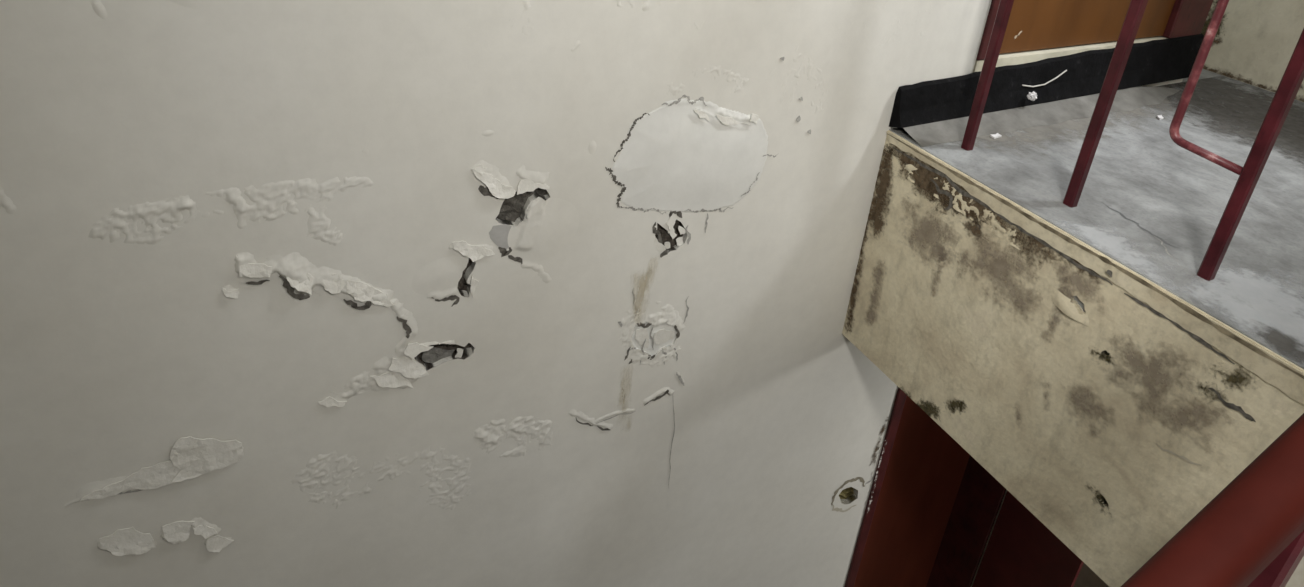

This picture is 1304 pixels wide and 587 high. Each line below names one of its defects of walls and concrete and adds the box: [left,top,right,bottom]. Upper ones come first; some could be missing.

water stain [1201,1,1225,44]
spalling [411,160,579,307]
spalling [652,211,691,258]
water stain [845,129,1099,331]
water stain [1055,223,1162,283]
peeling [221,252,475,408]
spalling [618,288,689,368]
water stain [1187,269,1304,362]
water stain [1116,343,1216,429]
peeling [64,436,243,508]
spalling [831,420,888,513]
peeling [95,517,234,556]